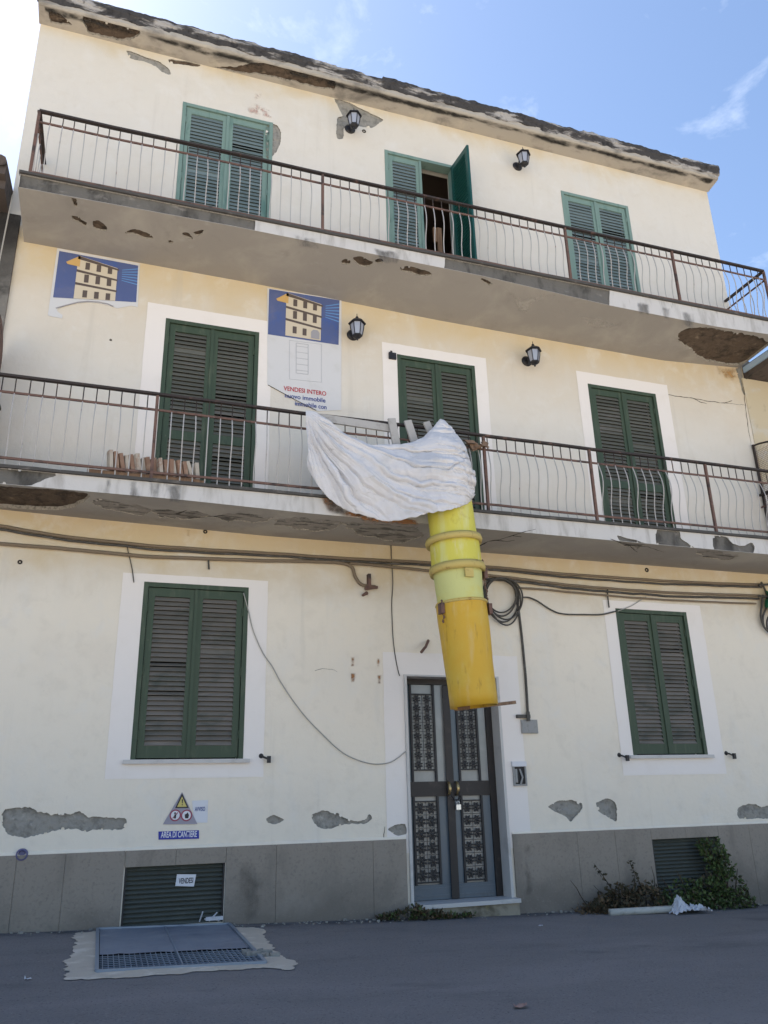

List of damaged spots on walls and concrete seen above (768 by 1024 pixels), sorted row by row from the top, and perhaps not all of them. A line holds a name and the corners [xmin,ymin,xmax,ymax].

spalling [49,12,200,75]
spalling [216,63,383,139]
peeling [19,174,255,244]
spalling [341,256,383,267]
spalling [678,327,768,394]
spalling [0,468,424,543]
peeling [617,530,755,561]
spalling [0,807,128,838]
spalling [311,810,372,829]
spalling [548,800,582,822]
spalling [596,799,618,821]
spalling [737,804,768,819]